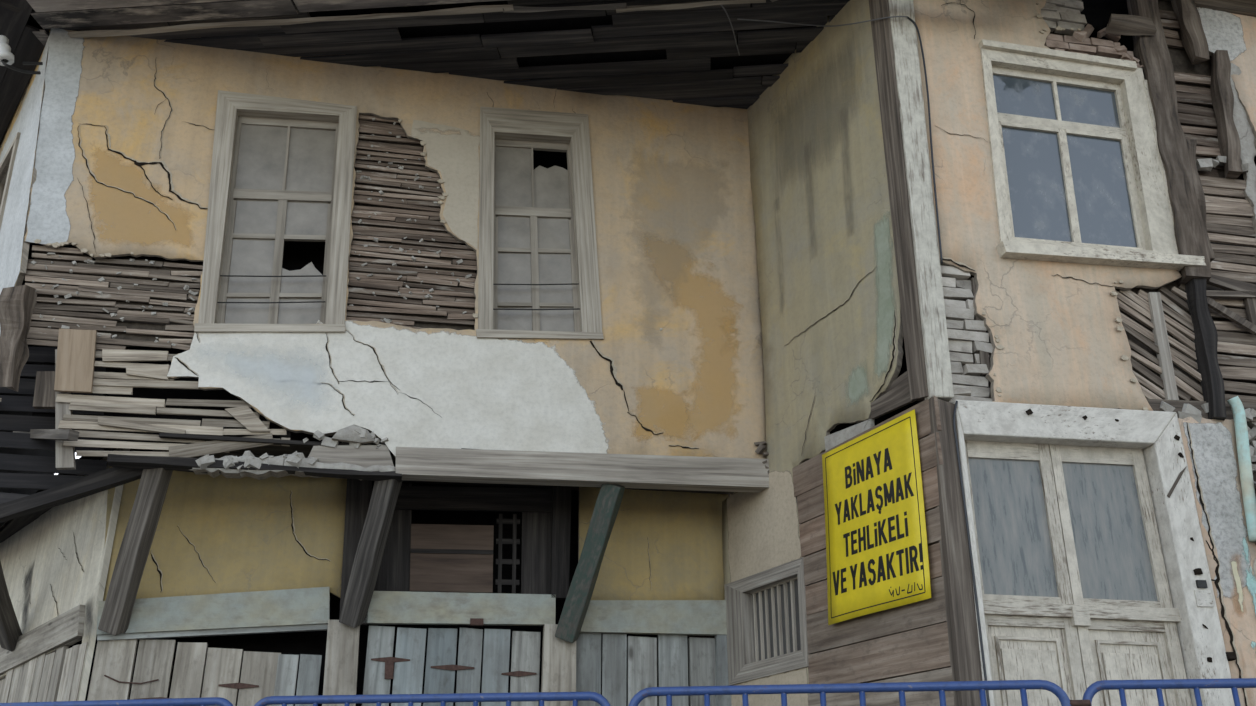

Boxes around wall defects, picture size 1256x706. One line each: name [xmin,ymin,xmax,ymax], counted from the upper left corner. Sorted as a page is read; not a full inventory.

spalling [1035,0,1140,68]
crack [77,58,215,254]
peeling [0,28,609,457]
crack [316,330,441,417]
crack [590,339,700,449]
leakage [636,238,735,436]
crack [786,266,877,345]
spalling [940,264,1004,403]
spalling [1110,280,1204,411]
spalling [1158,0,1256,404]
crack [1187,422,1248,706]
peeling [1183,422,1256,614]